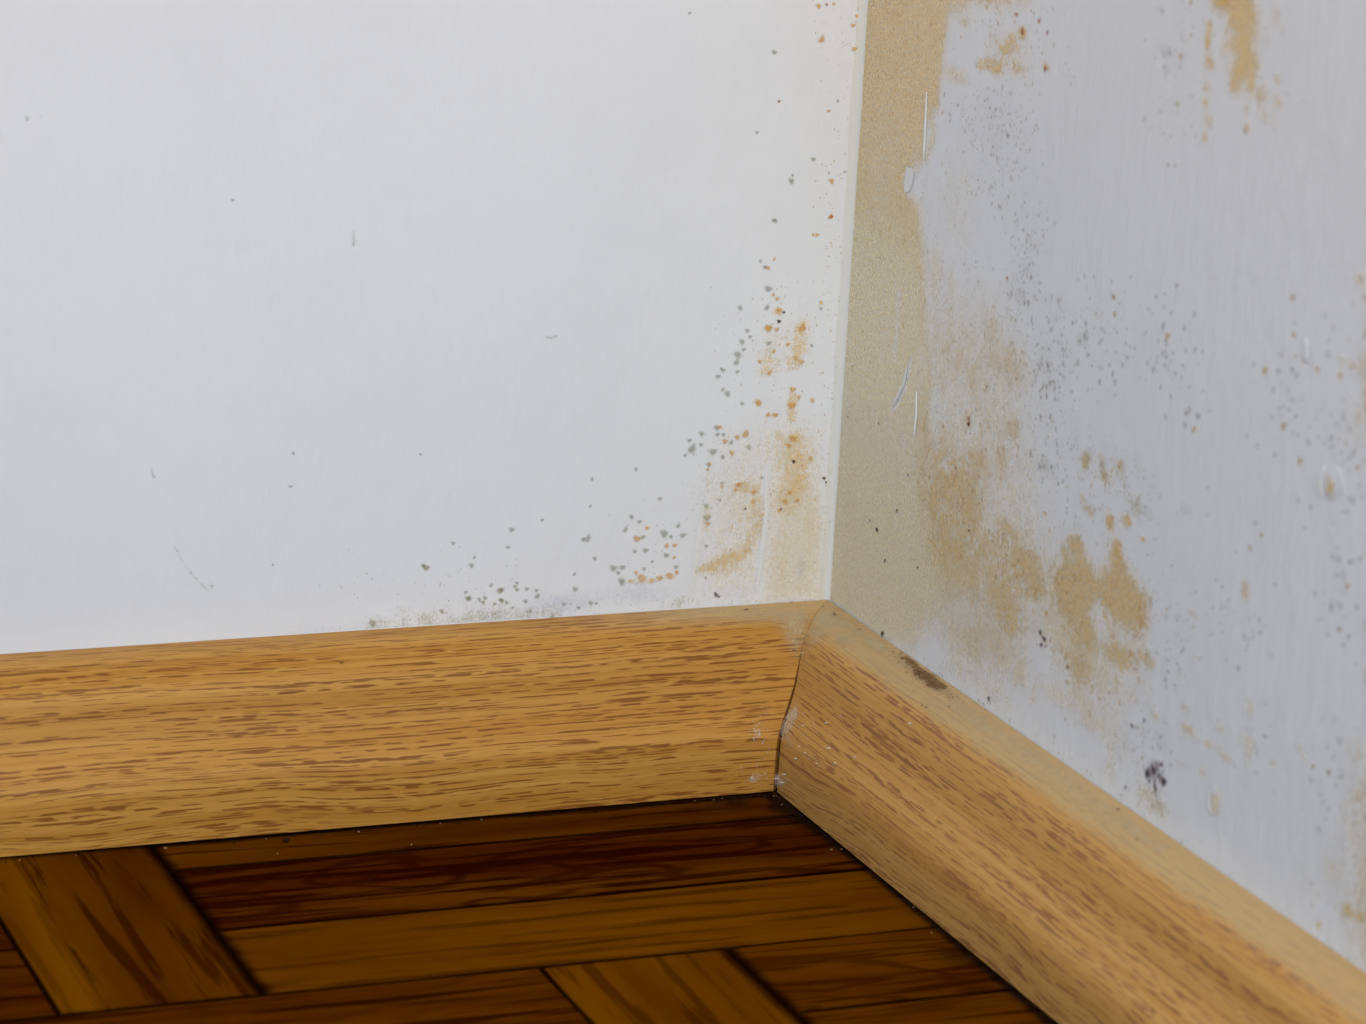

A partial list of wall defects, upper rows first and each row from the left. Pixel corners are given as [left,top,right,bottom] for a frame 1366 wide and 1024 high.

water stain [758,294,805,375]
water stain [823,0,1167,728]
water stain [700,388,816,571]